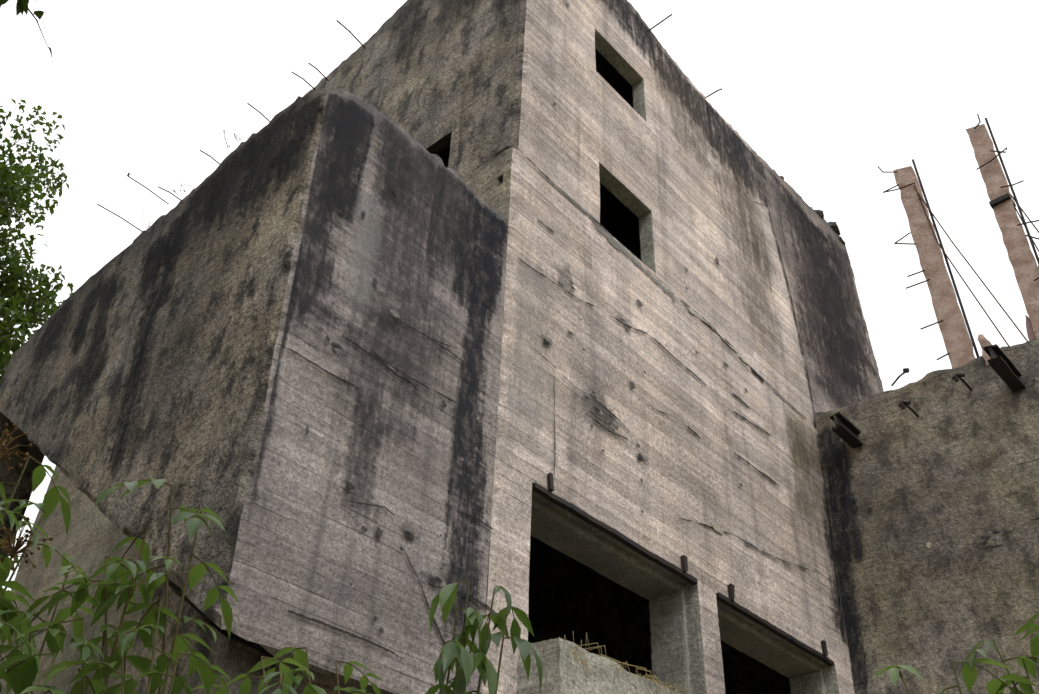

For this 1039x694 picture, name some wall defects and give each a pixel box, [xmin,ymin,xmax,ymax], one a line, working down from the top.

damp [103,93,507,637]
damp [603,0,875,408]
damp [818,429,868,694]